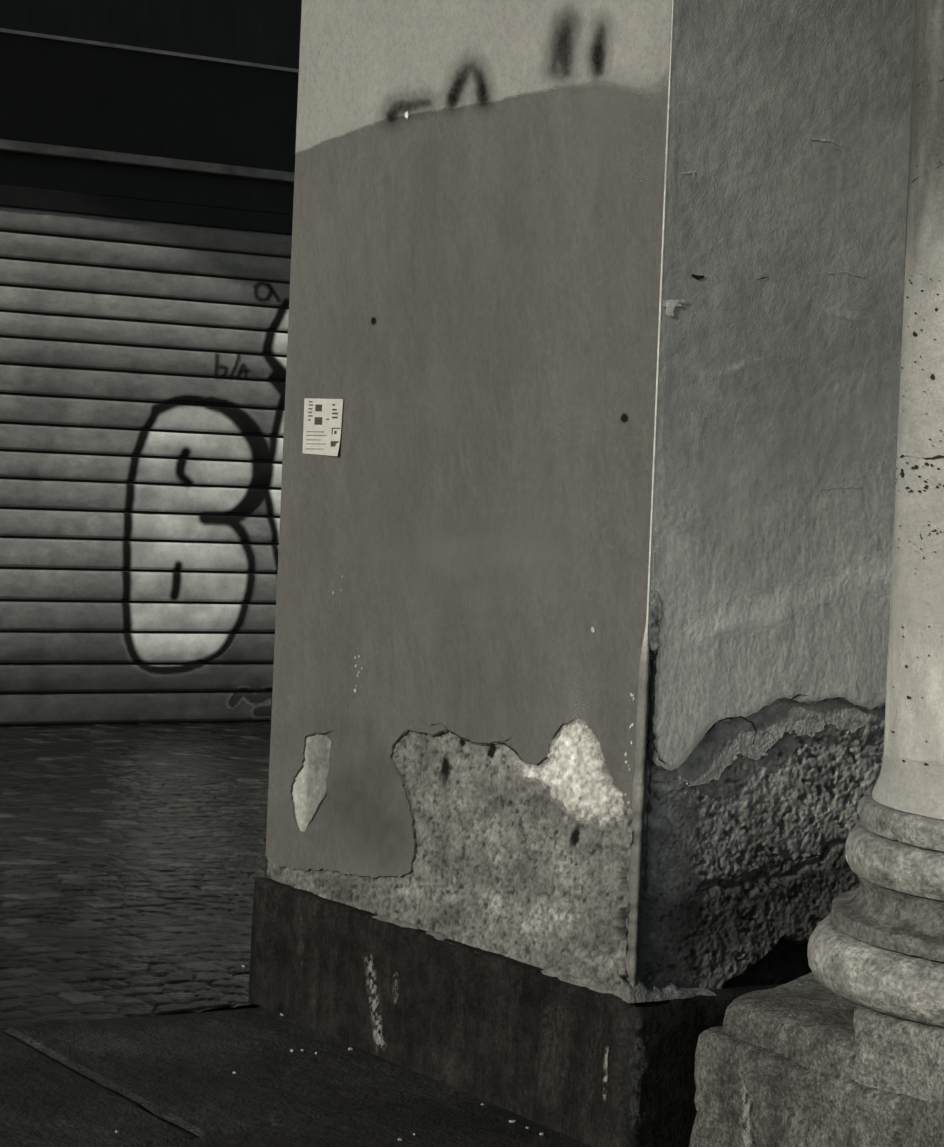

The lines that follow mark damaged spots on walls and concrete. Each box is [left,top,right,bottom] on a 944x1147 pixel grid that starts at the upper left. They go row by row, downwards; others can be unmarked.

crack [900,453,944,461]
spalling [267,699,886,1079]